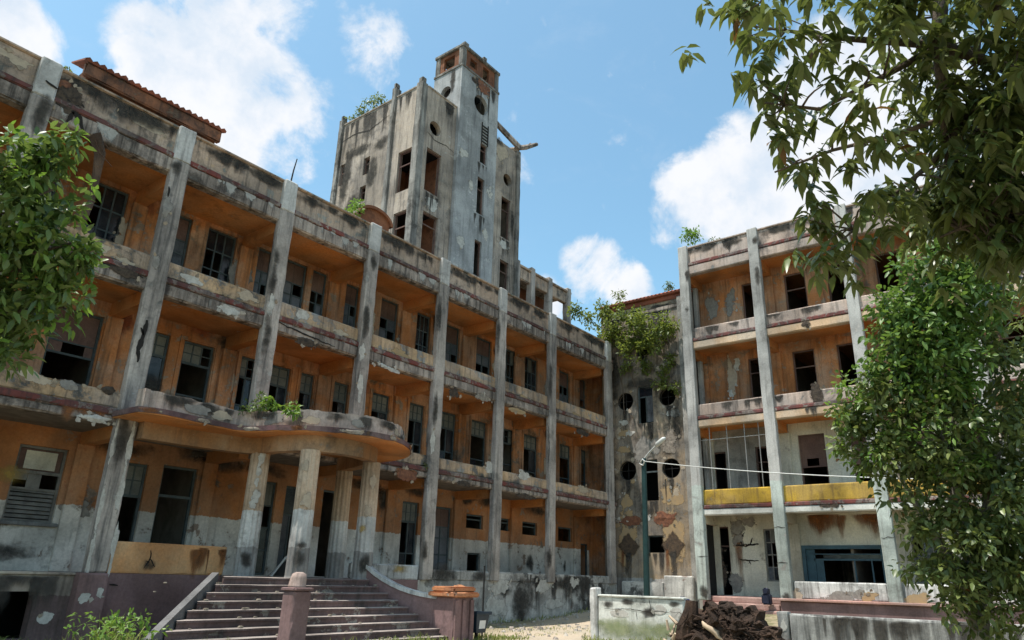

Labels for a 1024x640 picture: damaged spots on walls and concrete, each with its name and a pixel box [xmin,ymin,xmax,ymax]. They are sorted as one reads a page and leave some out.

damp [303,92,412,247]
peeling [705,287,738,320]
crack [279,322,335,347]
peeling [727,355,740,399]
spalling [75,410,136,604]
corrosion [807,514,879,532]
crack [736,526,785,564]
peeling [485,579,512,618]
peeling [536,578,566,610]